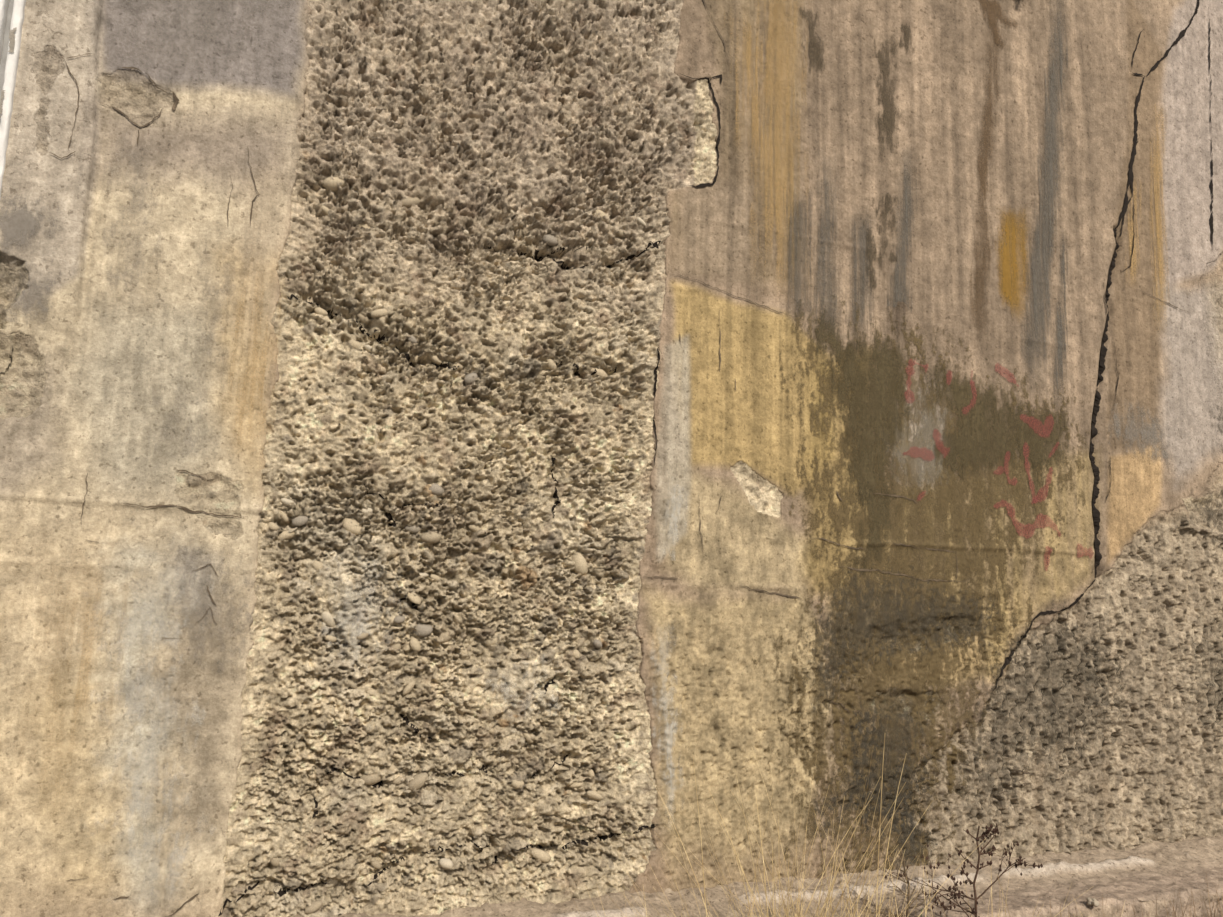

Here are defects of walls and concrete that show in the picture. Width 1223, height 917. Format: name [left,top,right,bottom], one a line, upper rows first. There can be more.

crack [45,53,179,159]
water stain [800,10,823,71]
water stain [979,0,1021,47]
crack [986,0,1214,710]
spalling [1198,253,1223,428]
crack [123,503,244,519]
spalling [175,0,719,917]
water stain [752,20,1089,877]
spalling [906,463,1223,866]